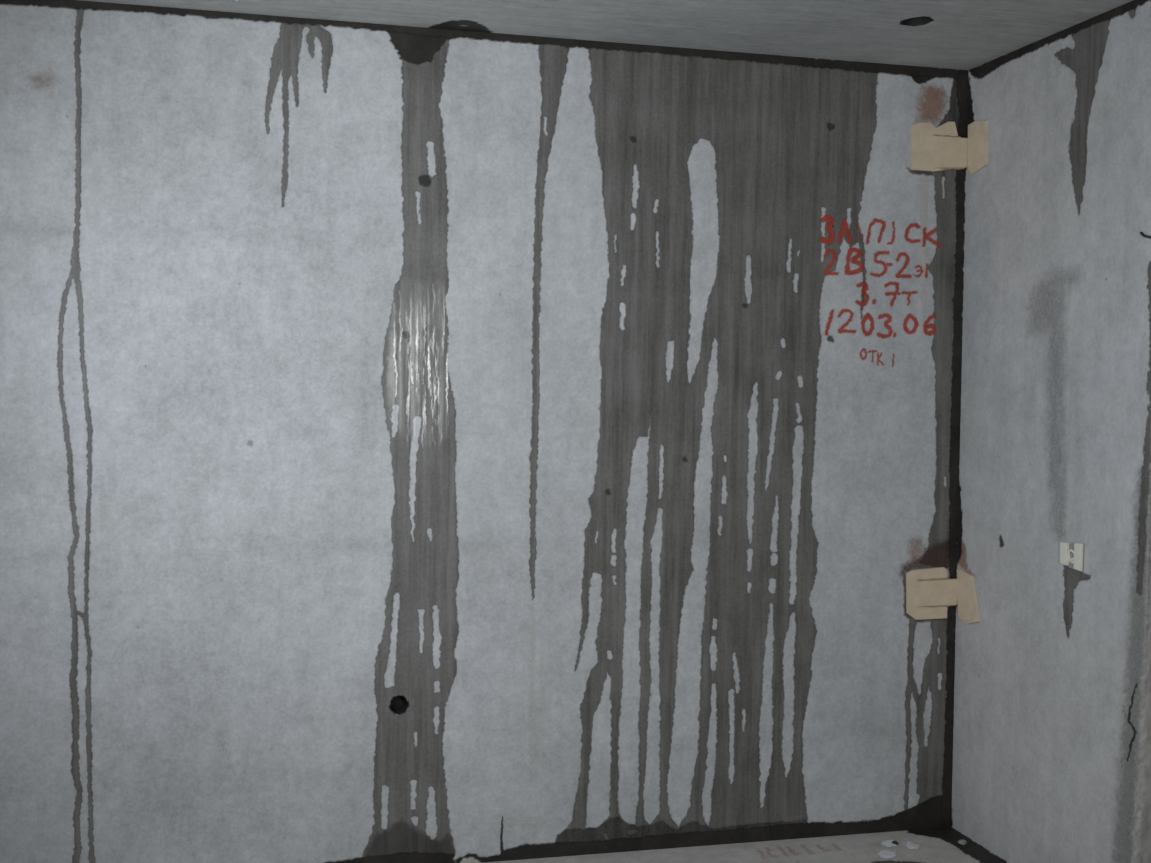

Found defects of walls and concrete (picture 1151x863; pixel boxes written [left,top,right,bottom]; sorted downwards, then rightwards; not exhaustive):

water stain [265,22,333,207]
rust [920,88,944,120]
water stain [1055,19,1111,214]
water stain [57,8,95,863]
water stain [362,20,492,858]
water stain [529,44,569,600]
water stain [555,48,878,843]
water stain [903,617,947,810]
rust [902,541,968,622]
water stain [921,169,957,568]
water stain [1137,261,1151,595]